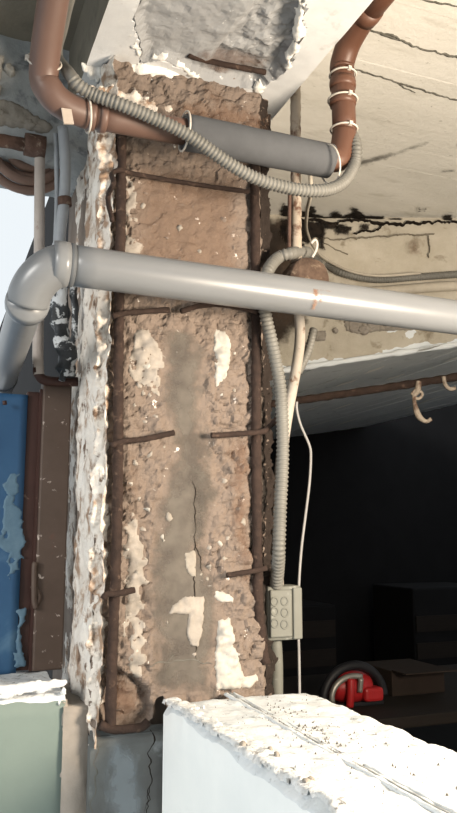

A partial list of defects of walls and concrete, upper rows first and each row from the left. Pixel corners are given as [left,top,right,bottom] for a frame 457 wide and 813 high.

crack [423,0,457,8]
crack [370,30,457,58]
peeling [0,55,53,134]
spalling [81,0,306,130]
crack [355,69,457,101]
spalling [75,130,273,272]
crack [301,218,457,258]
flaking render [305,321,414,346]
flaking render [304,342,457,374]
spalling [0,287,367,813]
crack [144,730,156,813]